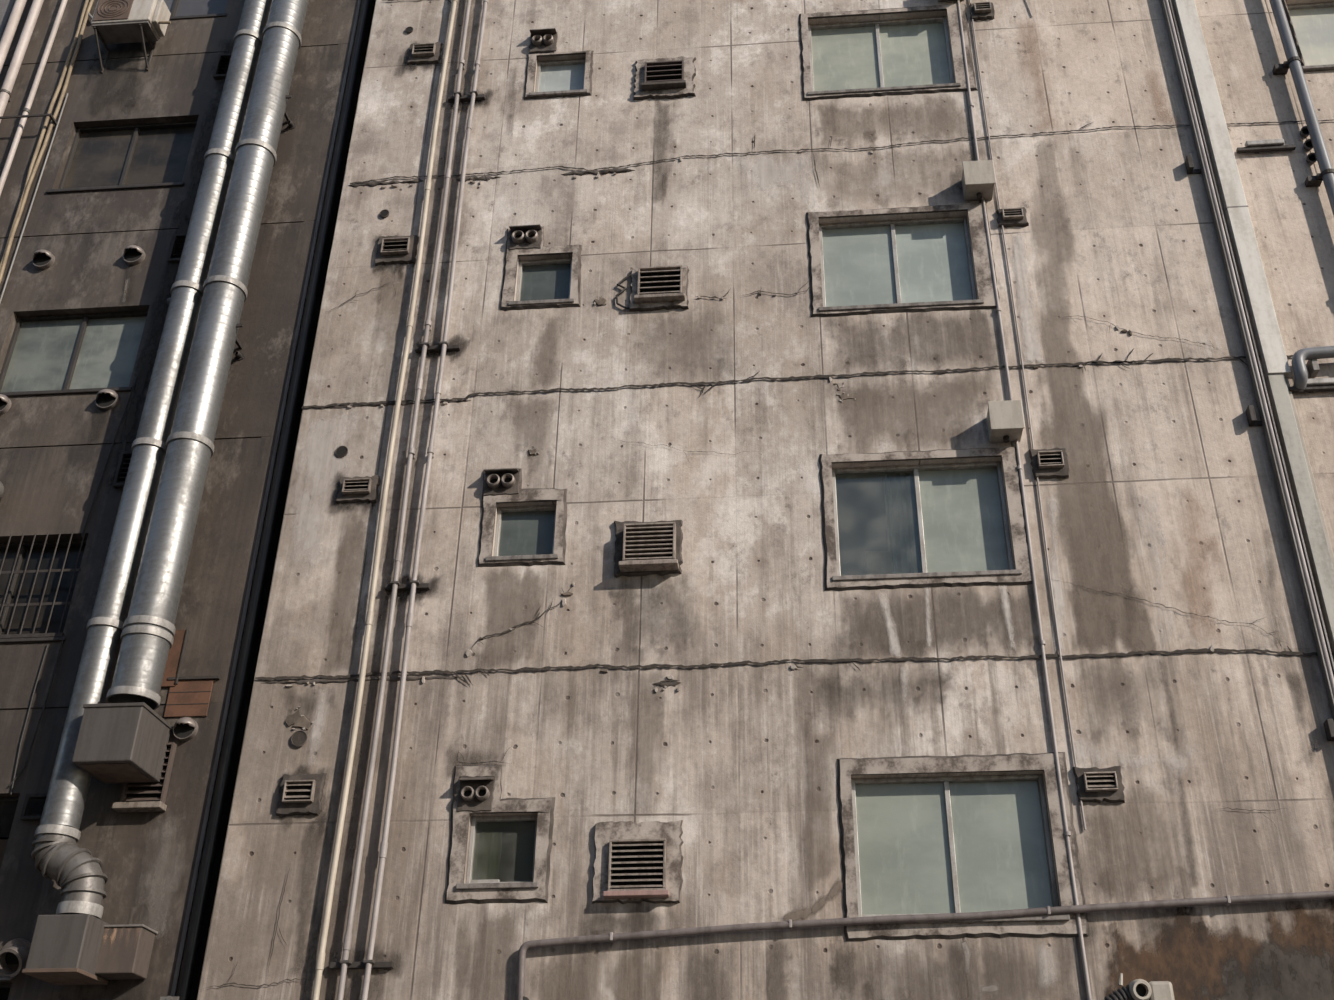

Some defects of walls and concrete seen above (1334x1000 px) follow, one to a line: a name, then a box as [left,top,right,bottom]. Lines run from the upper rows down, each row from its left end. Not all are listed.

leakage [655,104,670,156]
leakage [831,312,988,361]
leakage [1014,234,1156,655]
crack [255,580,1333,686]
leakage [850,587,1033,682]
leakage [1184,807,1196,884]
corrosion [1106,898,1334,1000]